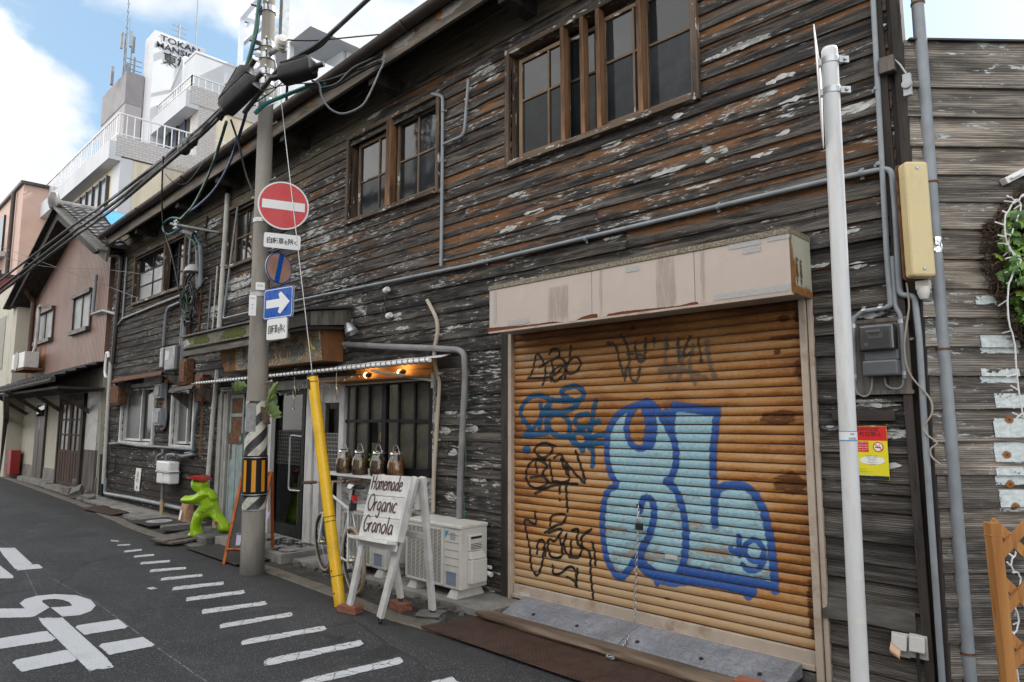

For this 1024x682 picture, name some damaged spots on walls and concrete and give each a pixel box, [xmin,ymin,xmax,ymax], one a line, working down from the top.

peeling [703,33,770,62]
peeling [756,72,808,108]
peeling [841,98,876,116]
peeling [700,146,728,164]
peeling [651,164,687,179]
peeling [500,207,567,233]
peeling [210,273,251,318]
peeling [975,296,997,305]
peeling [980,335,1020,353]
rust [760,410,796,425]
peeling [980,369,1024,511]
rust [773,471,807,495]